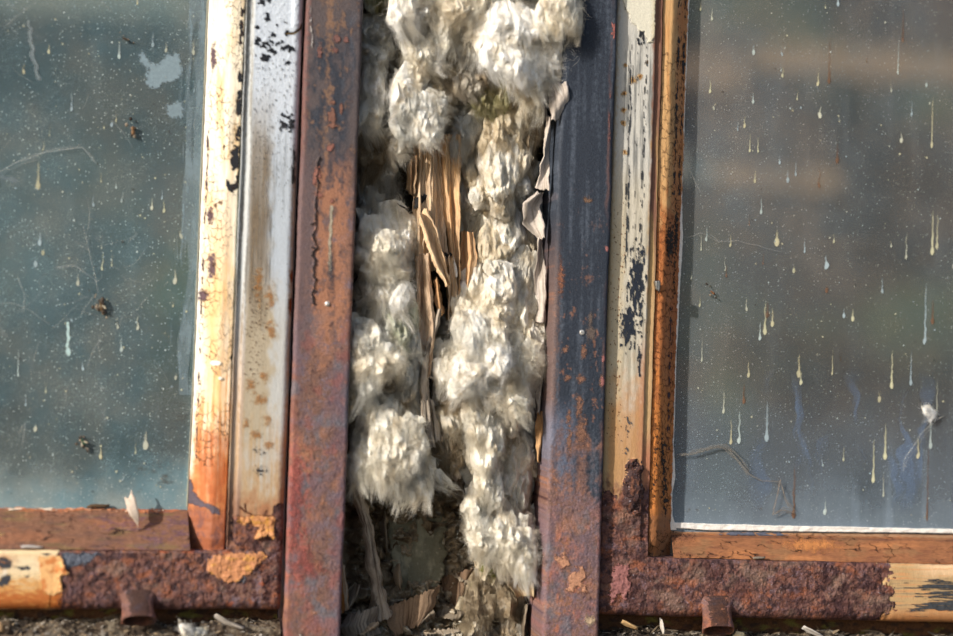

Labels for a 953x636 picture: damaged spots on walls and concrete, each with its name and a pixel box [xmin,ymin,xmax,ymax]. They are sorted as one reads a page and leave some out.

peeling [238,0,295,65]
peeling [623,0,656,158]
crack [196,1,297,464]
crack [310,157,321,305]
peeling [617,169,647,377]
crack [650,52,685,506]
rust [566,396,587,456]
peeling [0,552,101,596]
rust [0,552,227,609]
rust [554,490,895,620]
crack [648,530,910,562]
peeling [910,579,953,612]